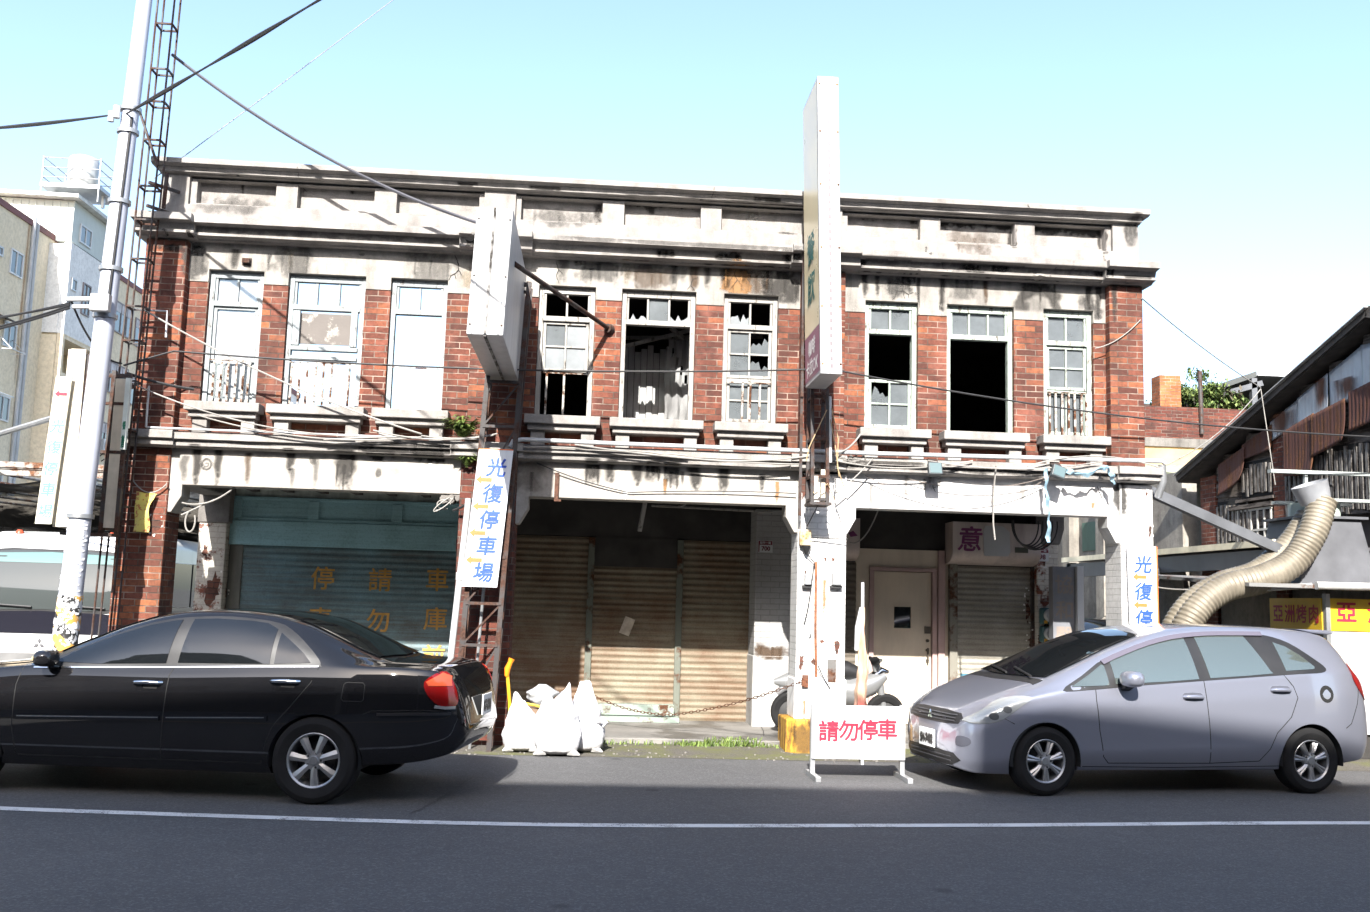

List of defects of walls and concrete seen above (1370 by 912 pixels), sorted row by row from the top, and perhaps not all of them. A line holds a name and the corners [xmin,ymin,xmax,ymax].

leakage [940,222,1017,246]
leakage [1035,212,1141,252]
rust [721,258,752,294]
leakage [705,252,800,303]
leakage [860,259,921,302]
leakage [1015,279,1061,310]
leakage [1080,269,1151,321]
rust [1315,376,1352,407]
leakage [181,444,222,484]
leakage [585,458,701,499]
leakage [719,465,729,489]
peeling [199,541,230,609]